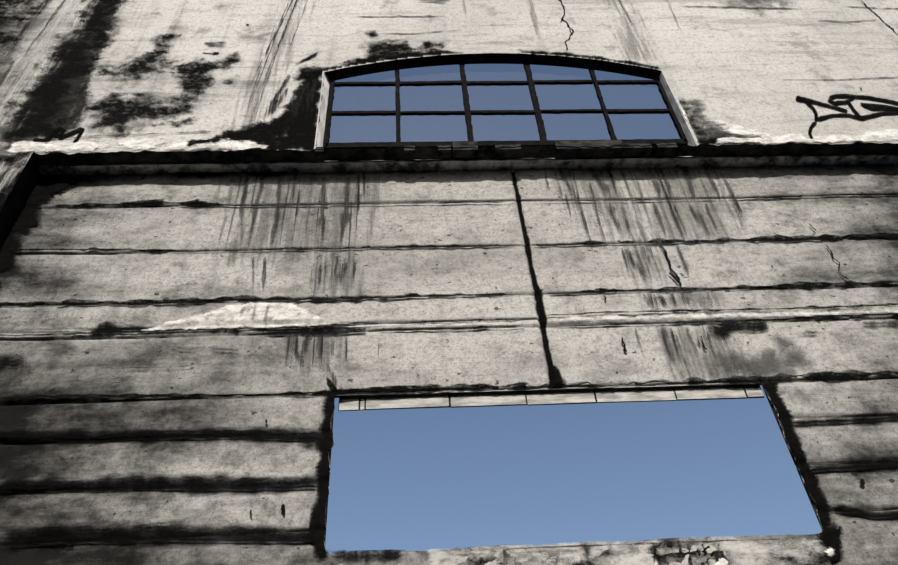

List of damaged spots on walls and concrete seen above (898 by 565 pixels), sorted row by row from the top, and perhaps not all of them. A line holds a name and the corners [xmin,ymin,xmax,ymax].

leakage [0,0,240,210]
crack [560,0,574,50]
crack [782,74,896,82]
crack [819,1,898,35]
leakage [537,165,898,278]
leakage [0,280,898,565]